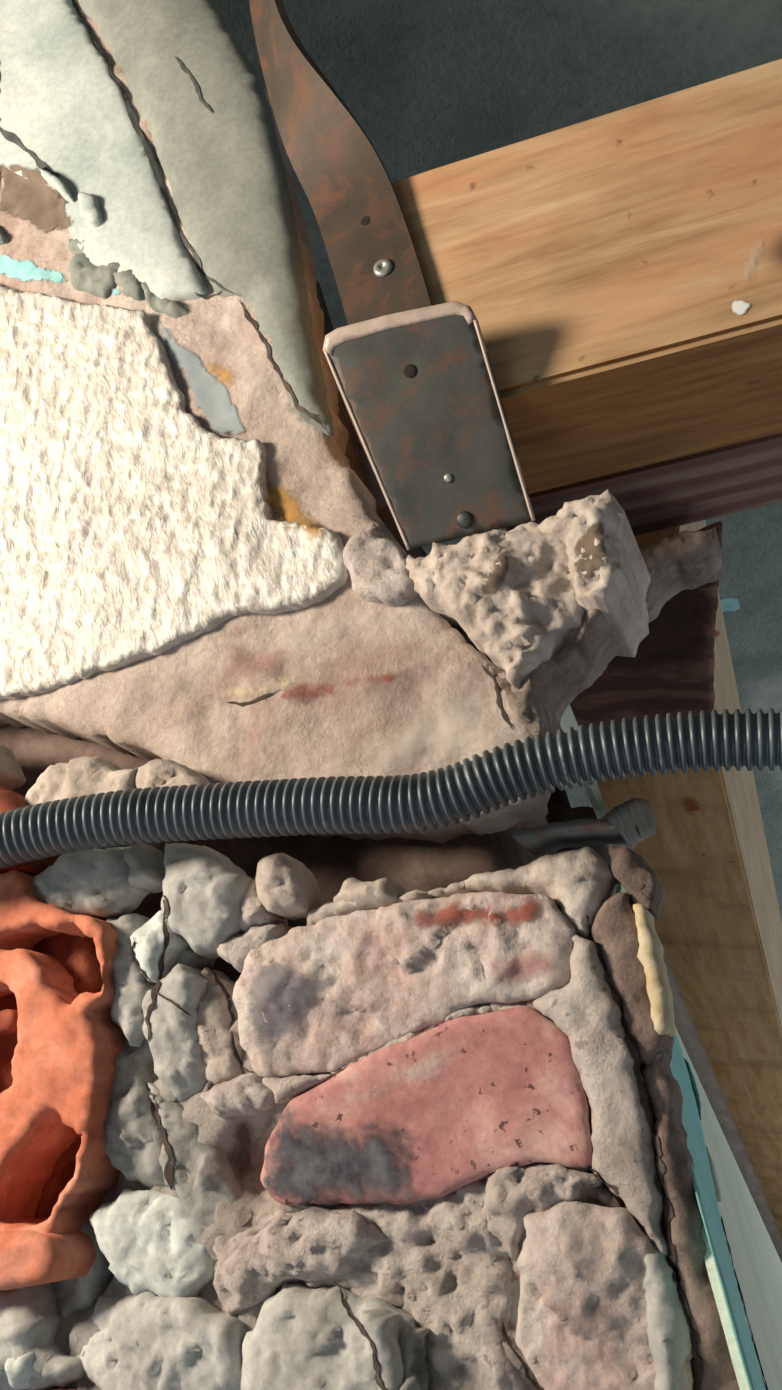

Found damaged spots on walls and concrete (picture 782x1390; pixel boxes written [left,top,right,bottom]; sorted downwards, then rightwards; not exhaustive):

crack [0,128,68,203]
crack [72,0,329,435]
spalling [0,164,244,434]
crack [131,895,192,1043]
crack [209,960,253,1073]
crack [586,915,703,1390]
peeling [670,1033,766,1390]
crack [333,1281,386,1390]
crack [500,1312,543,1390]